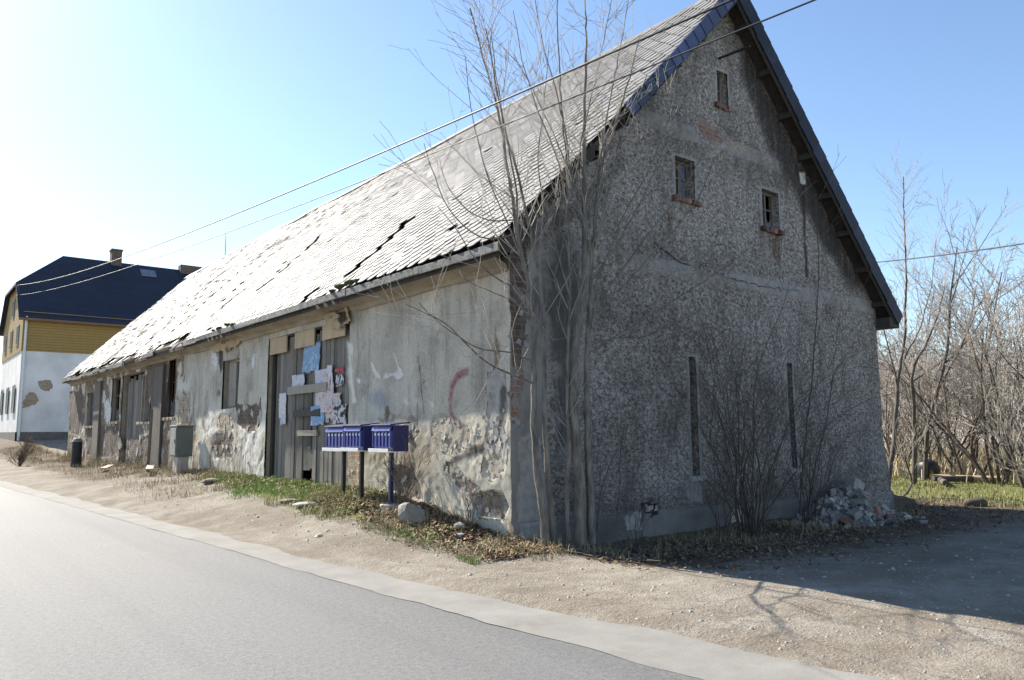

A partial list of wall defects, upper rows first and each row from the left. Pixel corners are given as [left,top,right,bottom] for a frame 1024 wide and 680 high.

crack [654,242,798,292]
flaking render [22,380,53,408]
flaking render [378,240,534,521]
flaking render [69,389,148,465]
flaking render [212,396,262,459]